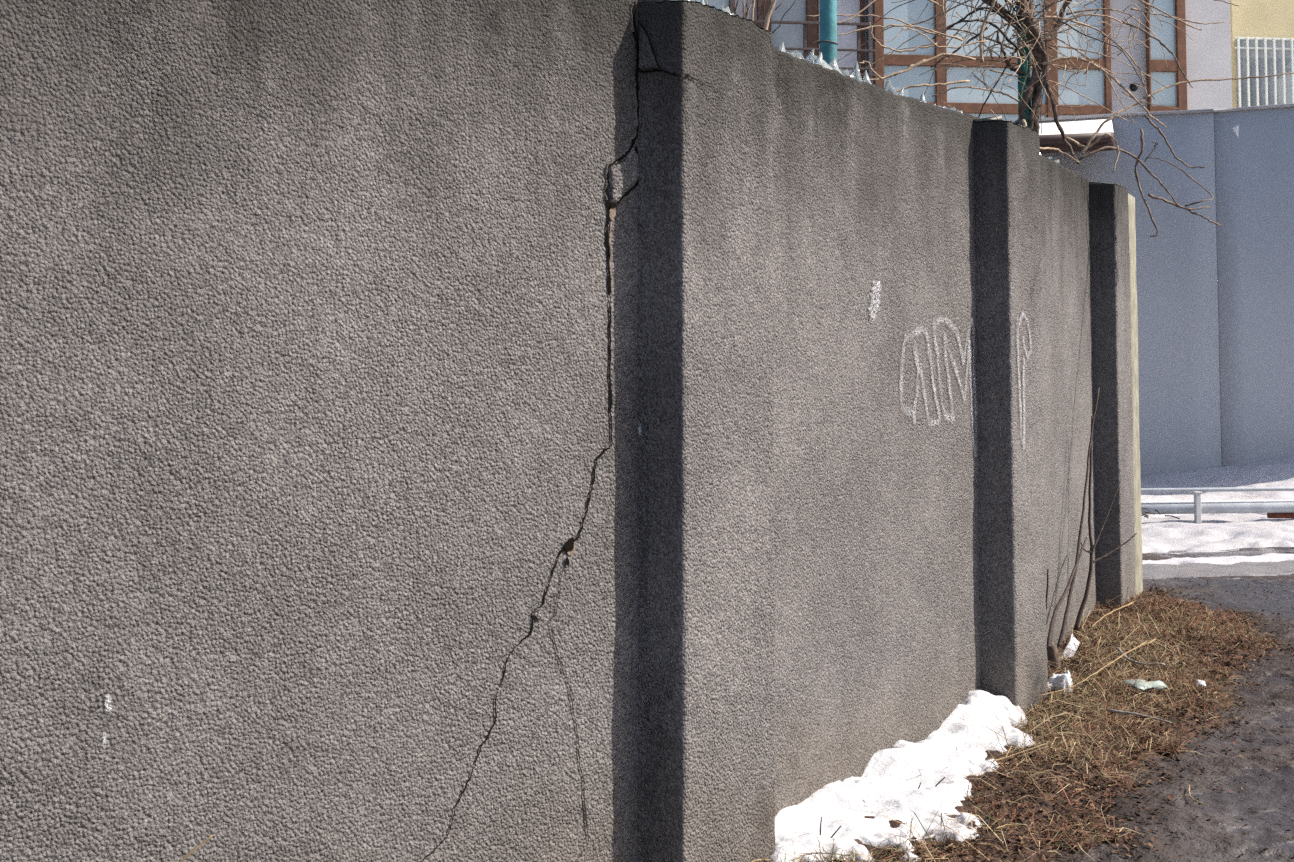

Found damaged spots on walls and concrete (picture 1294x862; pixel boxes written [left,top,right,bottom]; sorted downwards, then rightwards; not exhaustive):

crack [421,0,711,862]